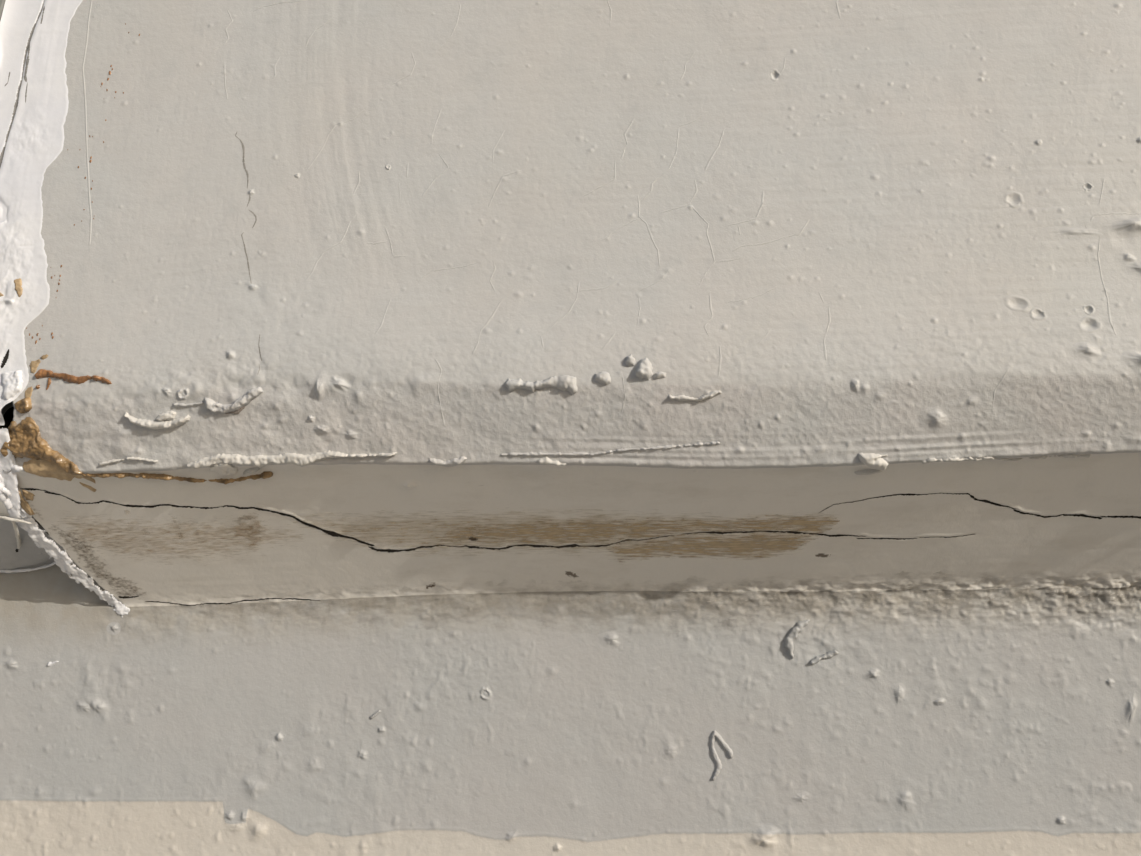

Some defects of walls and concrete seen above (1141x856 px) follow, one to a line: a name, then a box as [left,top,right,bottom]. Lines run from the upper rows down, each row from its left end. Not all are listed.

corrosion [0,278,23,297]
corrosion [0,325,273,492]
crack [20,488,1141,553]
water stain [437,515,838,557]
crack [118,596,320,606]